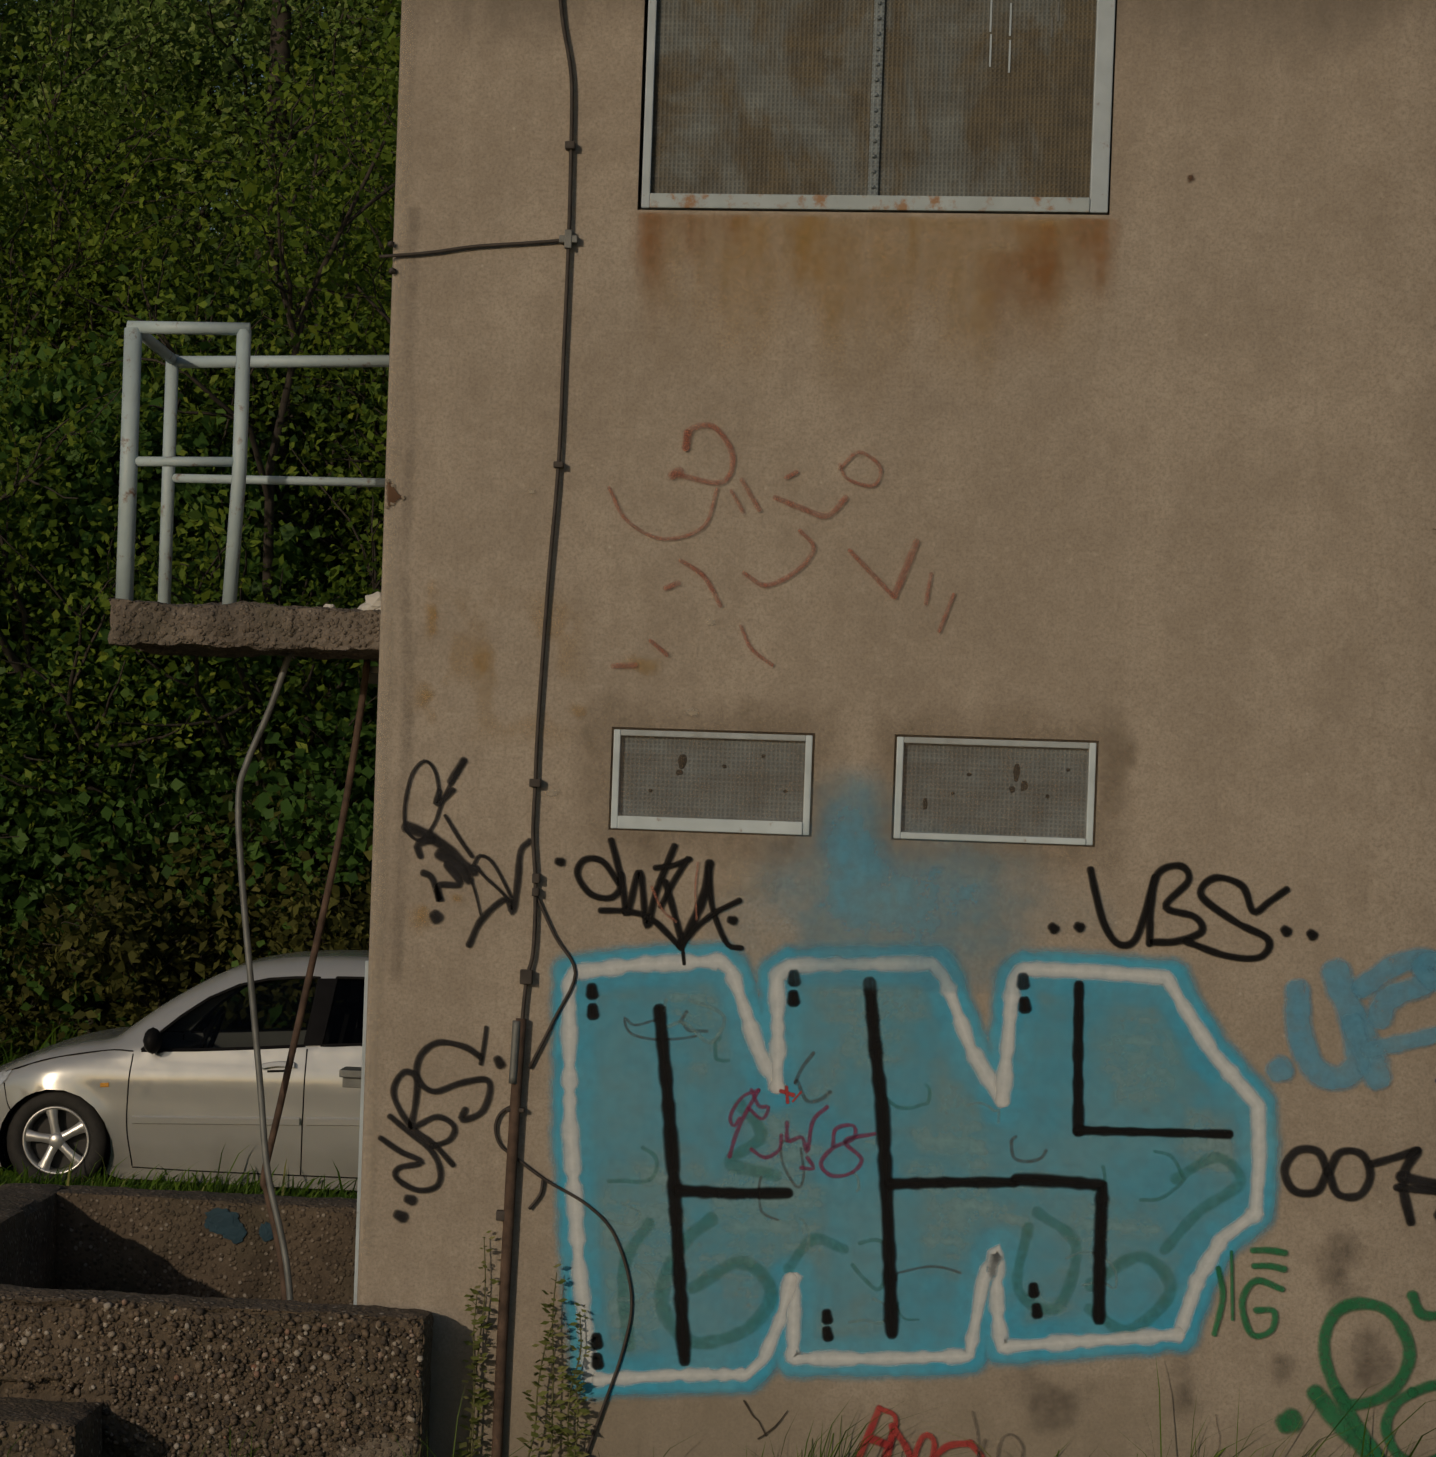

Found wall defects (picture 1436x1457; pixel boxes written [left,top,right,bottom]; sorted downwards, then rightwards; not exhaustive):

spalling [0,1297,424,1457]